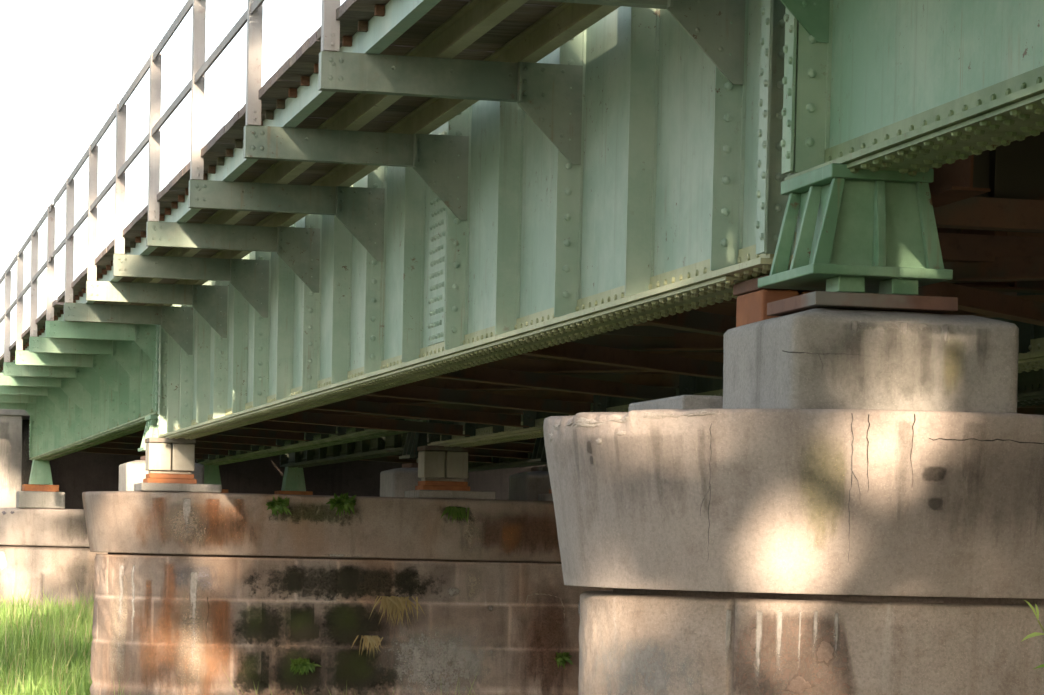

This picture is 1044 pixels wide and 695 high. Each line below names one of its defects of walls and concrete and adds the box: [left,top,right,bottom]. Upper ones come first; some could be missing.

spalling [548,410,722,450]
crack [910,414,1044,485]
crack [700,424,712,558]
crack [848,413,870,560]
damp [284,566,301,594]
damp [330,554,359,596]
damp [397,569,420,596]